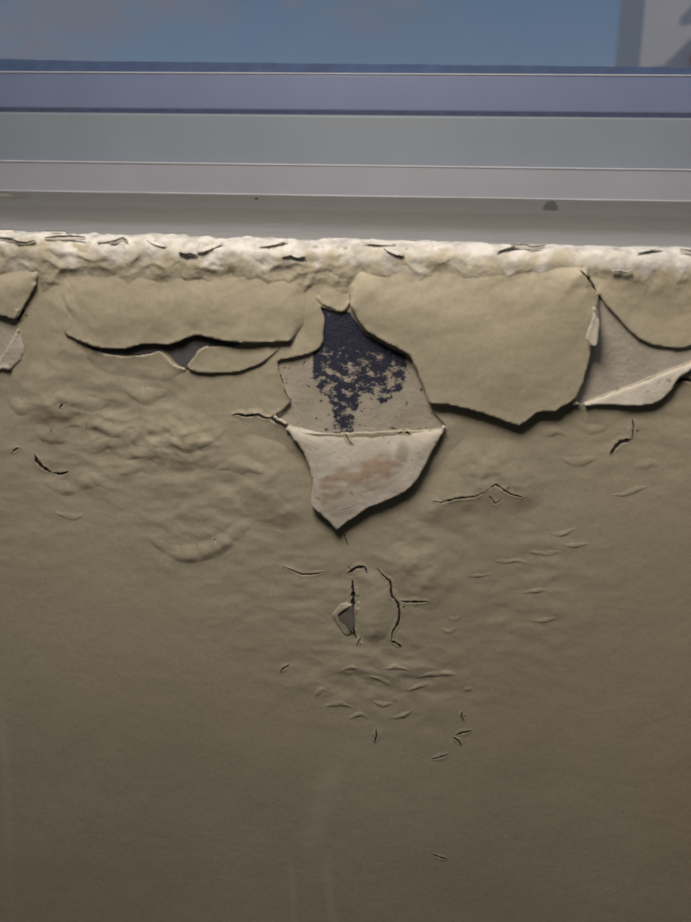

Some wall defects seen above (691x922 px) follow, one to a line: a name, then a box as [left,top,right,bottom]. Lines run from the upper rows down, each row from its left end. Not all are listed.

peeling [0,229,691,530]
crack [608,418,640,455]
crack [674,372,691,387]
crack [282,531,430,648]